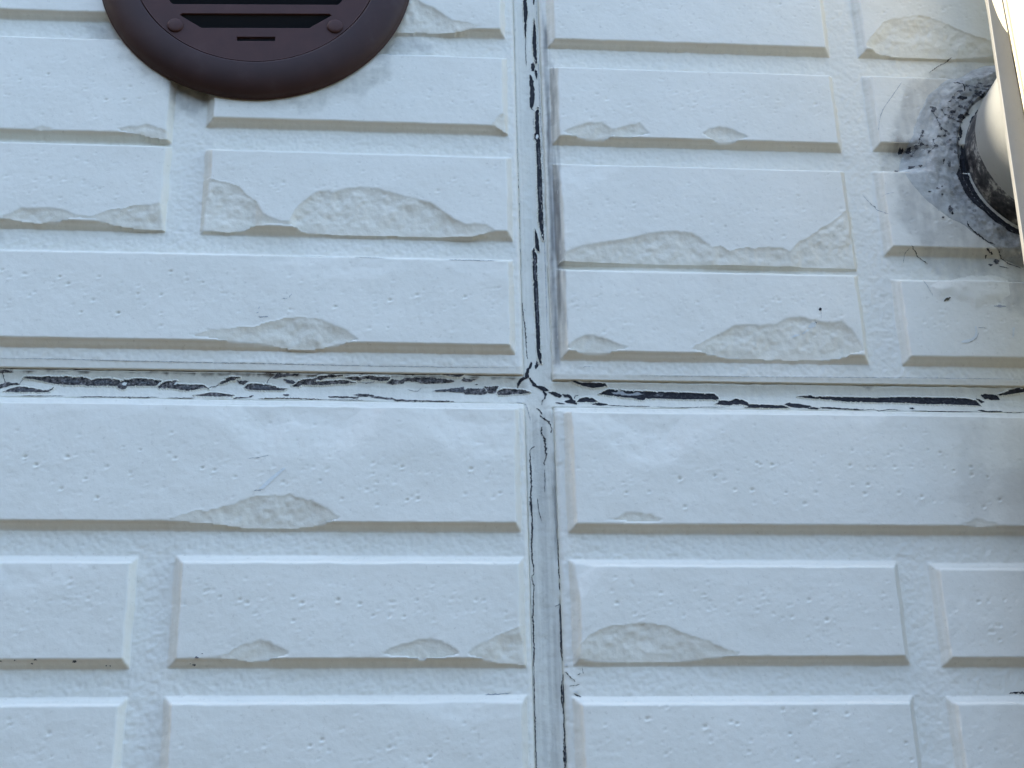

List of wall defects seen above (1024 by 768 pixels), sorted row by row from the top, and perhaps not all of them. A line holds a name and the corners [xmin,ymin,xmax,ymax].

spalling [395,0,477,34]
spalling [867,15,993,59]
spalling [3,203,166,230]
spalling [200,178,493,237]
crack [0,0,1024,492]
spalling [562,211,859,270]
spalling [195,307,355,350]
spalling [693,308,863,361]
spalling [170,468,338,529]
crack [529,447,542,768]
crack [558,548,567,768]
spalling [564,622,739,697]